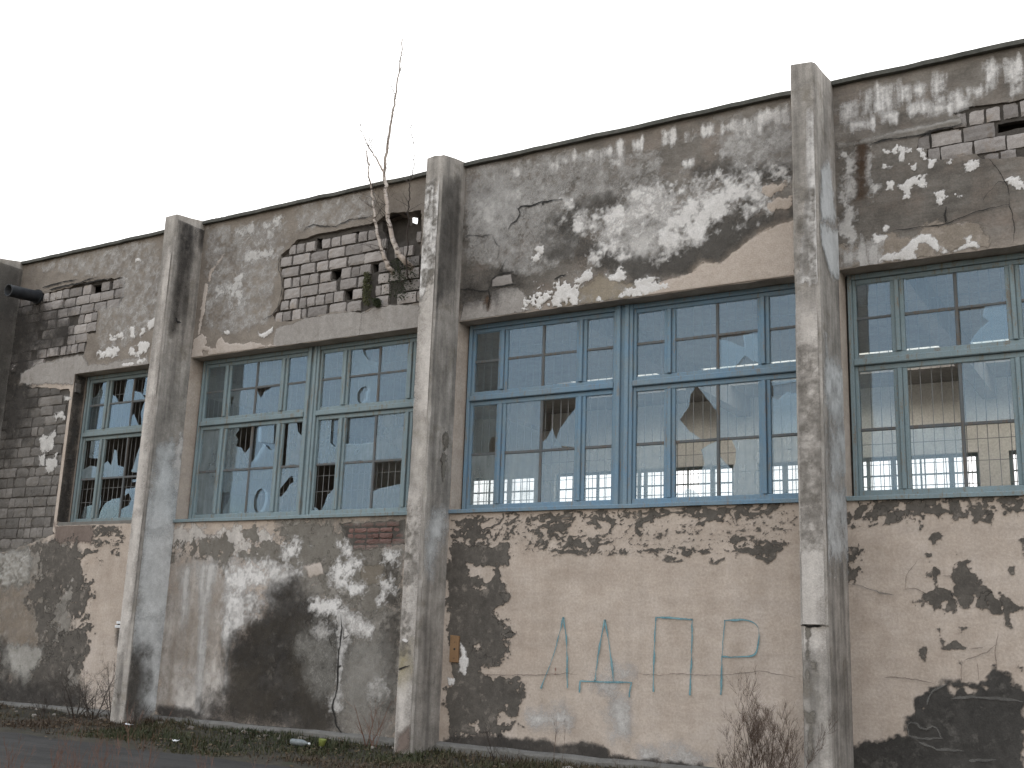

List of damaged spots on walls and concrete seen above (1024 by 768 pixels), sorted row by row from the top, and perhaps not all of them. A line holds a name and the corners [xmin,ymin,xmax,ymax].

peeling [273,182,438,346]
crack [460,199,560,305]
peeling [605,266,660,298]
peeling [882,144,980,205]
crack [887,160,1015,240]
peeling [1005,176,1024,190]
peeling [19,317,155,420]
water stain [157,499,410,730]
spalling [440,346,846,739]
peeling [846,496,1024,629]
water stain [0,642,85,707]
crack [329,621,347,733]